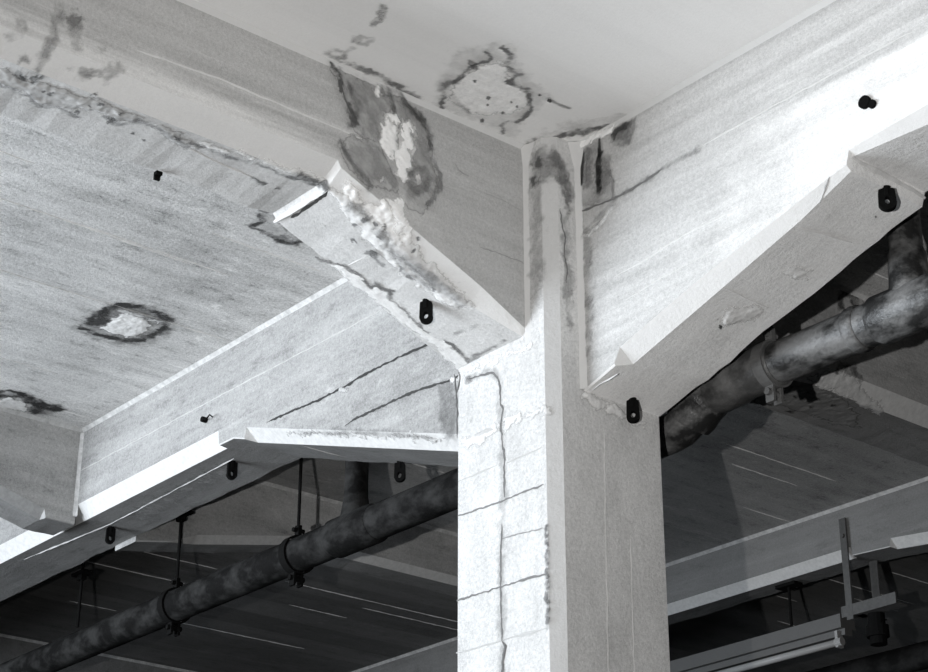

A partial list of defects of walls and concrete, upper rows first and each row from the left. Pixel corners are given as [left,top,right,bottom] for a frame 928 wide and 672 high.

leakage [438,47,552,123]
spalling [0,61,475,309]
leakage [530,153,572,214]
leakage [249,210,302,246]
leakage [78,303,173,344]
peeling [315,257,469,370]
leakage [0,390,66,414]
crack [268,344,428,422]
crack [345,346,545,672]